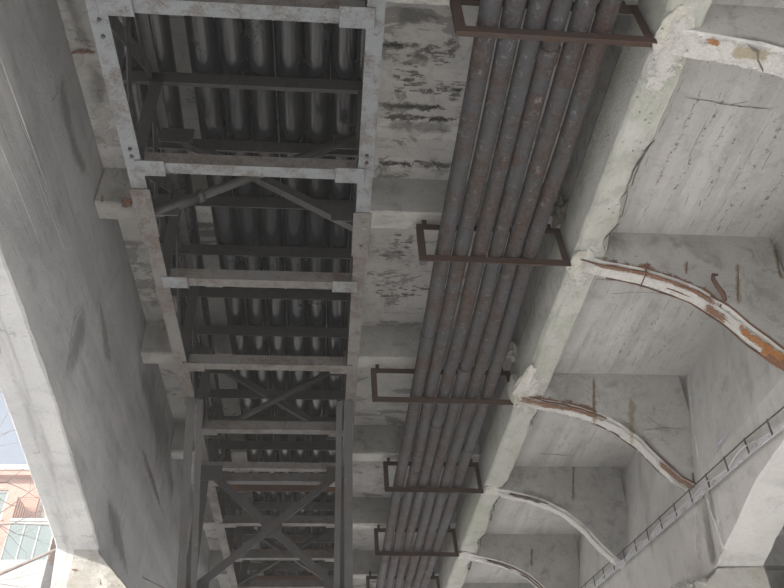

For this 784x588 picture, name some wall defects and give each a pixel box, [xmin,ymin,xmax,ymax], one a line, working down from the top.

spalling [671,33,784,78]
crack [661,79,783,231]
spalling [581,140,784,371]
spalling [520,384,696,488]
spalling [467,557,543,588]
spalling [489,482,616,562]